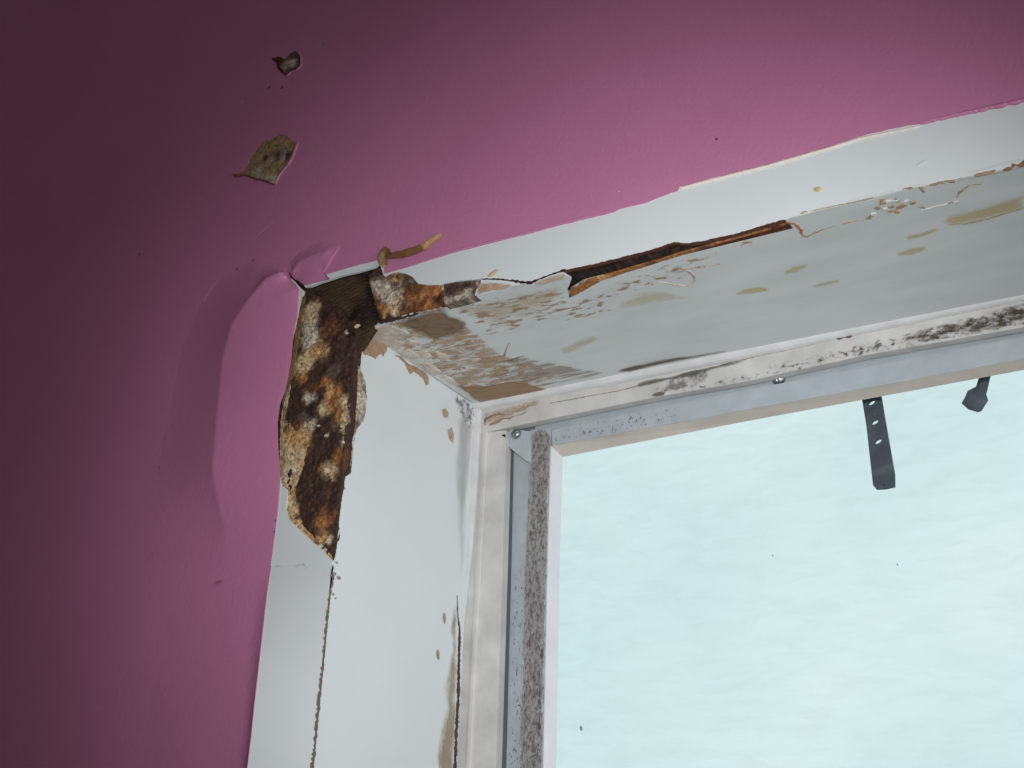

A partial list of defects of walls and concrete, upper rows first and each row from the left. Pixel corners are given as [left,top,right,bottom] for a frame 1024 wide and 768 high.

peeling [272,50,303,76]
peeling [232,134,298,185]
peeling [378,233,443,267]
spalling [444,280,482,309]
corrosion [459,265,679,331]
damp [818,304,1024,362]
damp [391,312,598,442]
damp [621,355,738,397]
flaking render [280,325,458,559]
mould [511,410,672,768]
crack [310,561,341,768]
crack [453,596,461,768]